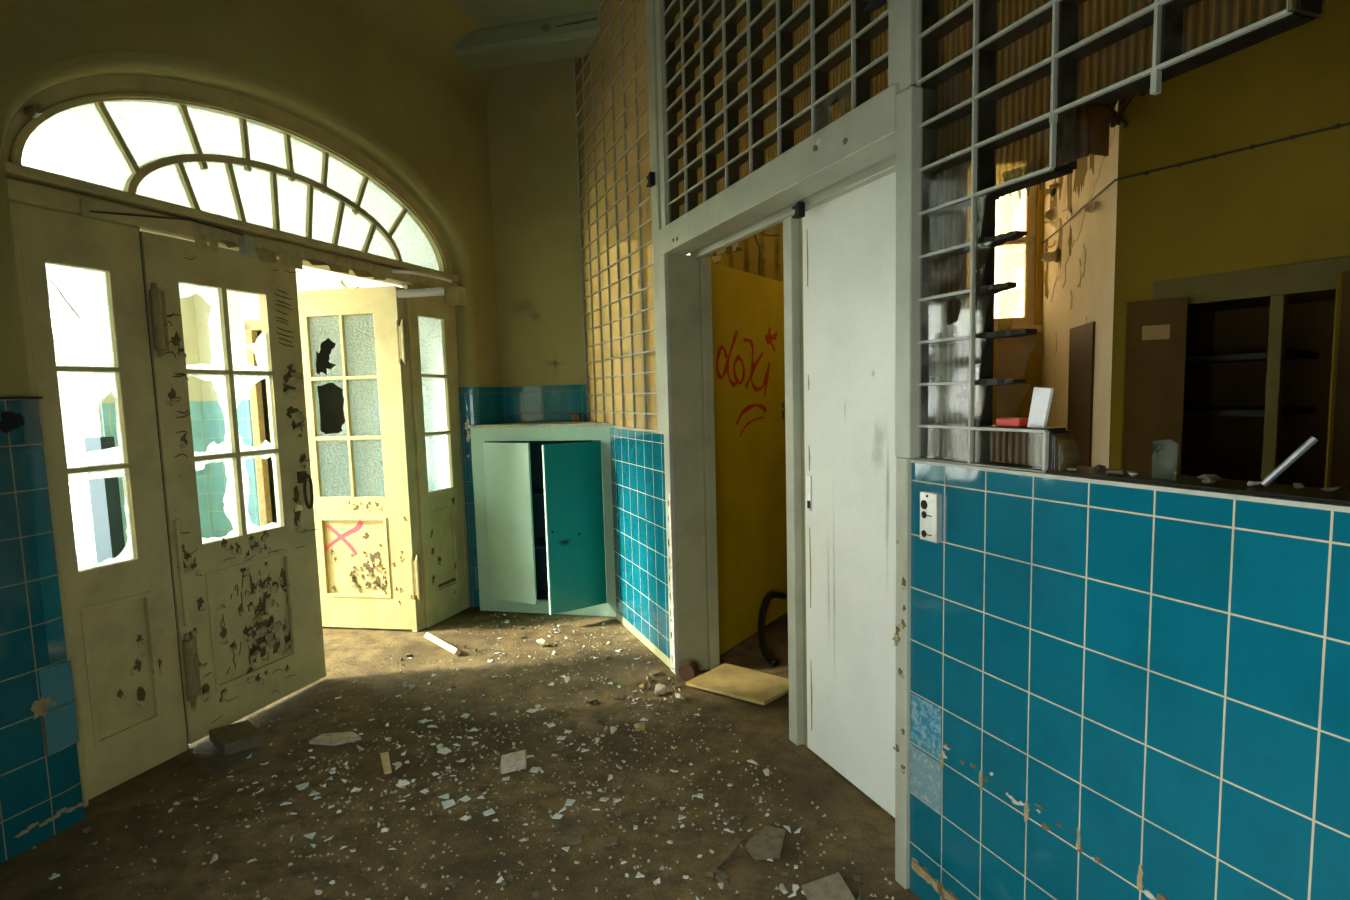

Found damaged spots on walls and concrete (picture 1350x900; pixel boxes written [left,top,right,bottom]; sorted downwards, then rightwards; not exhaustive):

peeling [892,558,907,646]
spalling [30,697,56,720]
spalling [893,693,942,813]
peeling [911,857,959,900]